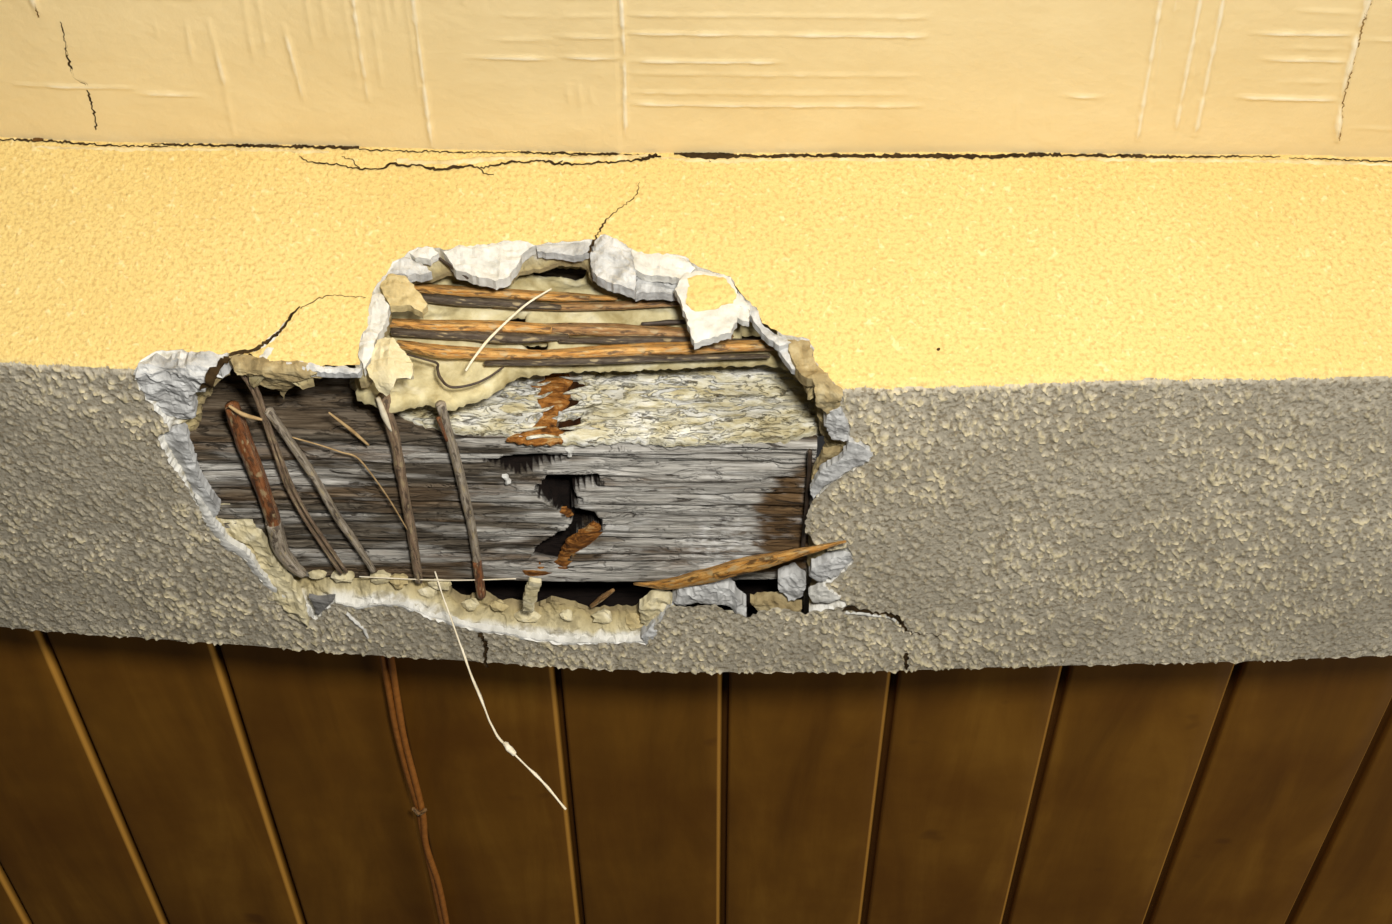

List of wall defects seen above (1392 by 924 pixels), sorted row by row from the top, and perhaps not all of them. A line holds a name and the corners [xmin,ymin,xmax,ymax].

crack [0,1,1392,253]
crack [200,295,366,390]
spalling [133,234,873,645]
rust [506,373,585,446]
rust [522,506,603,576]